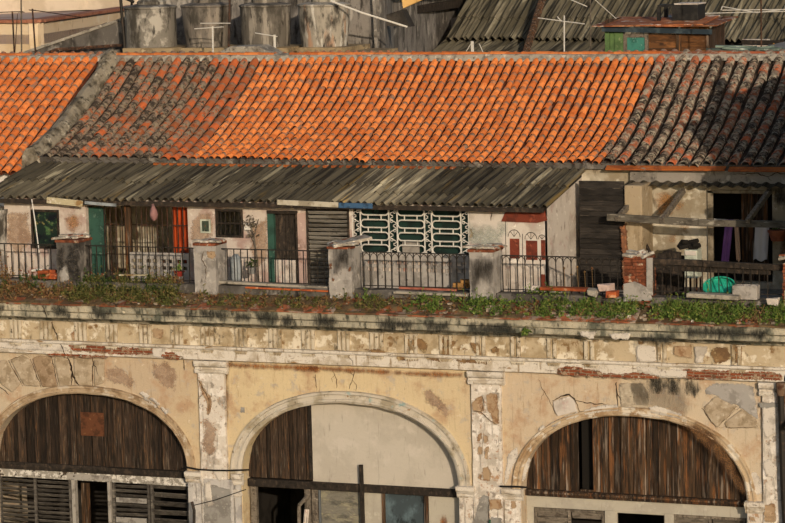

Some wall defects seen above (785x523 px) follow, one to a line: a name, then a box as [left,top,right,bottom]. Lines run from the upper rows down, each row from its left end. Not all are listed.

damp [186,310,225,321]
damp [236,313,293,327]
damp [314,316,336,329]
damp [380,319,412,331]
damp [467,323,516,335]
crack [0,306,98,395]
flaking render [0,328,181,392]
peeling [199,380,216,455]
flaking render [472,393,499,425]
crack [540,382,621,412]
flaking render [539,365,682,431]
flaking render [703,397,778,438]